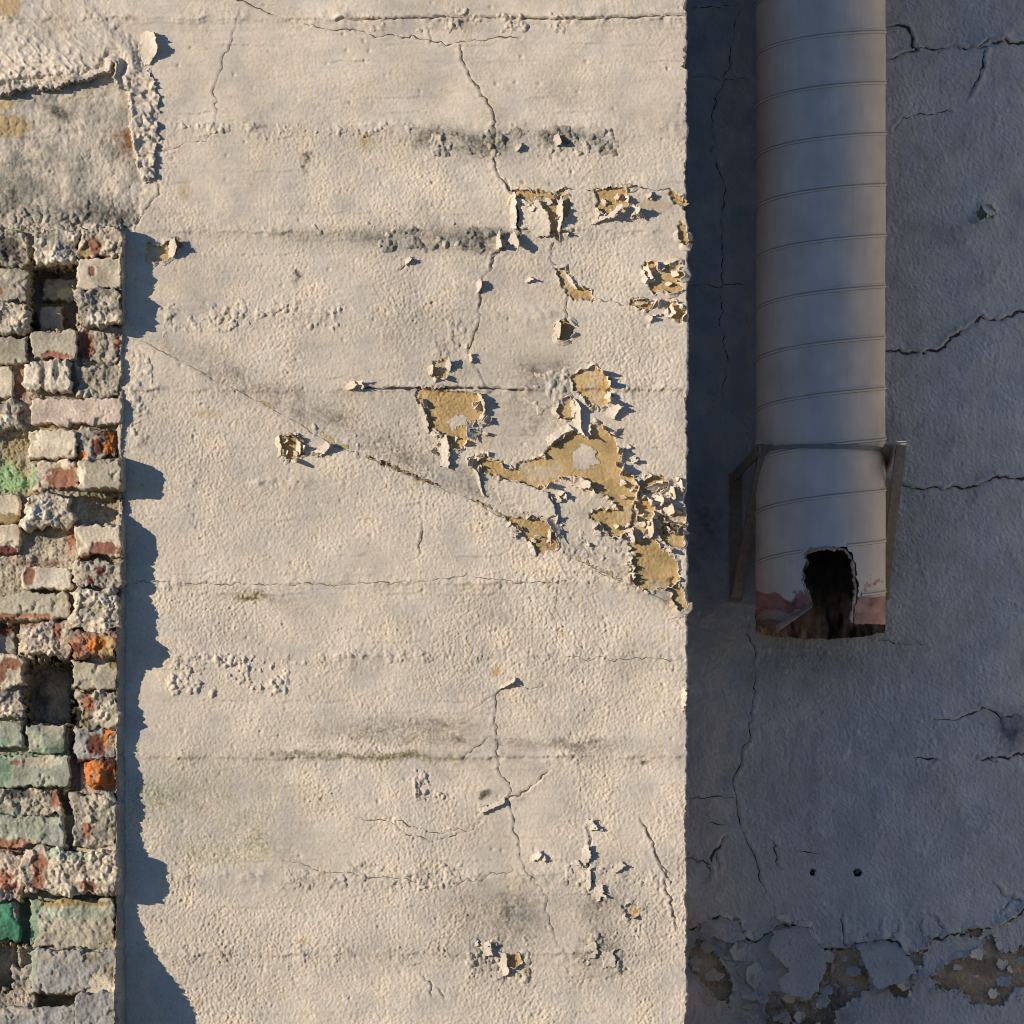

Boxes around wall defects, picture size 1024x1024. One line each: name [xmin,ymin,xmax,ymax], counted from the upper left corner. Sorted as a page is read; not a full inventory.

crack [890,24,1024,89]
crack [304,4,751,399]
peeling [590,182,653,225]
peeling [630,222,693,323]
peeling [552,316,579,346]
crack [887,310,1024,355]
peeling [274,432,330,465]
crack [133,342,679,662]
peeling [415,356,693,618]
crack [981,752,1024,761]
crack [287,686,554,933]
peeling [686,901,1024,1024]